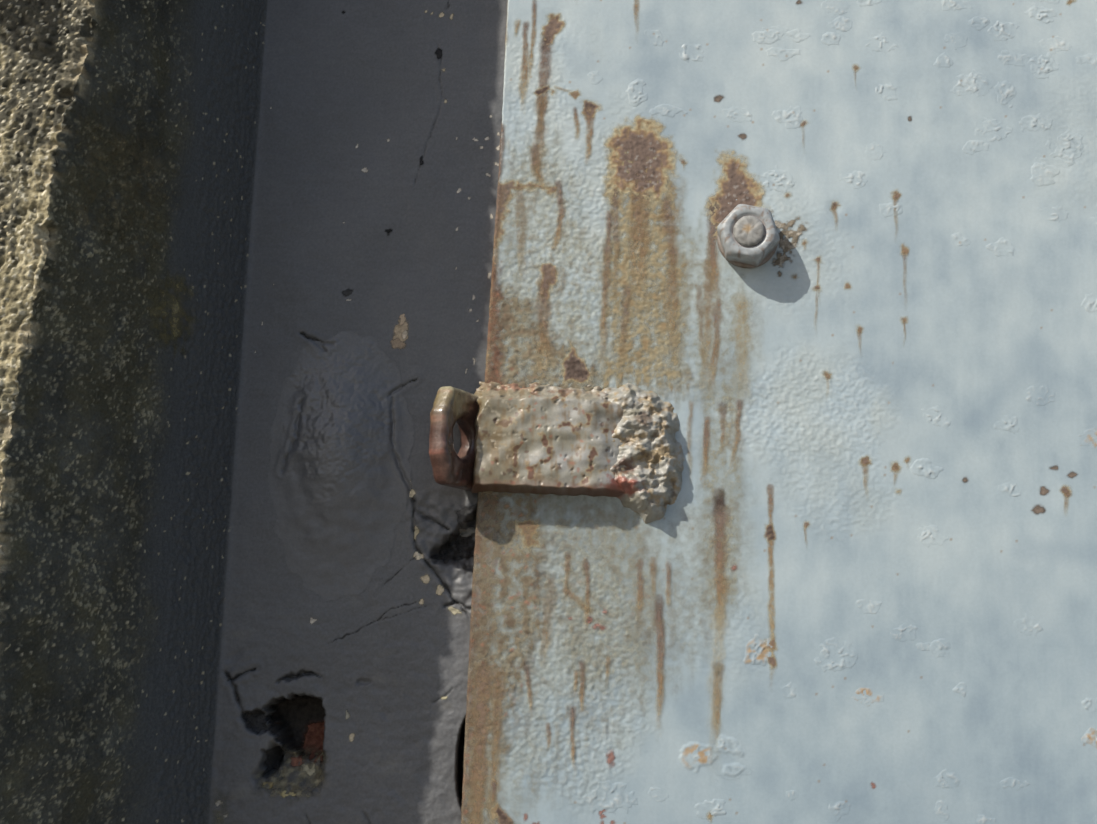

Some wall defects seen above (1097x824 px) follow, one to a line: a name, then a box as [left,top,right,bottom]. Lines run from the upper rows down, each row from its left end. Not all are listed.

crack [435,49,445,71]
corrosion [485,2,687,392]
corrosion [703,151,765,378]
hole [244,694,326,798]
crack [335,481,468,640]
corrosion [461,491,670,824]
corrosion [714,665,722,728]
corrosion [703,387,741,620]
corrosion [765,486,777,667]